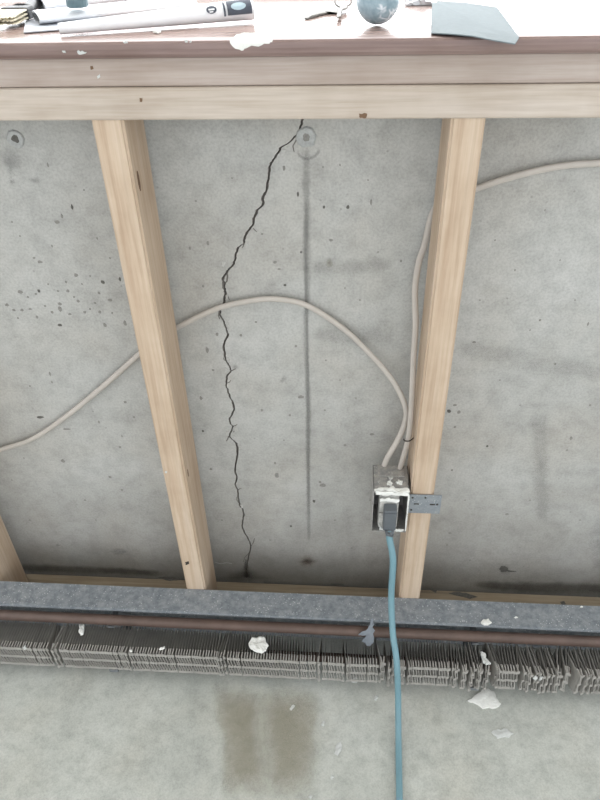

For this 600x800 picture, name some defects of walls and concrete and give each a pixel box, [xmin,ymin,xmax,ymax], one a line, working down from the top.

crack [216,119,304,583]